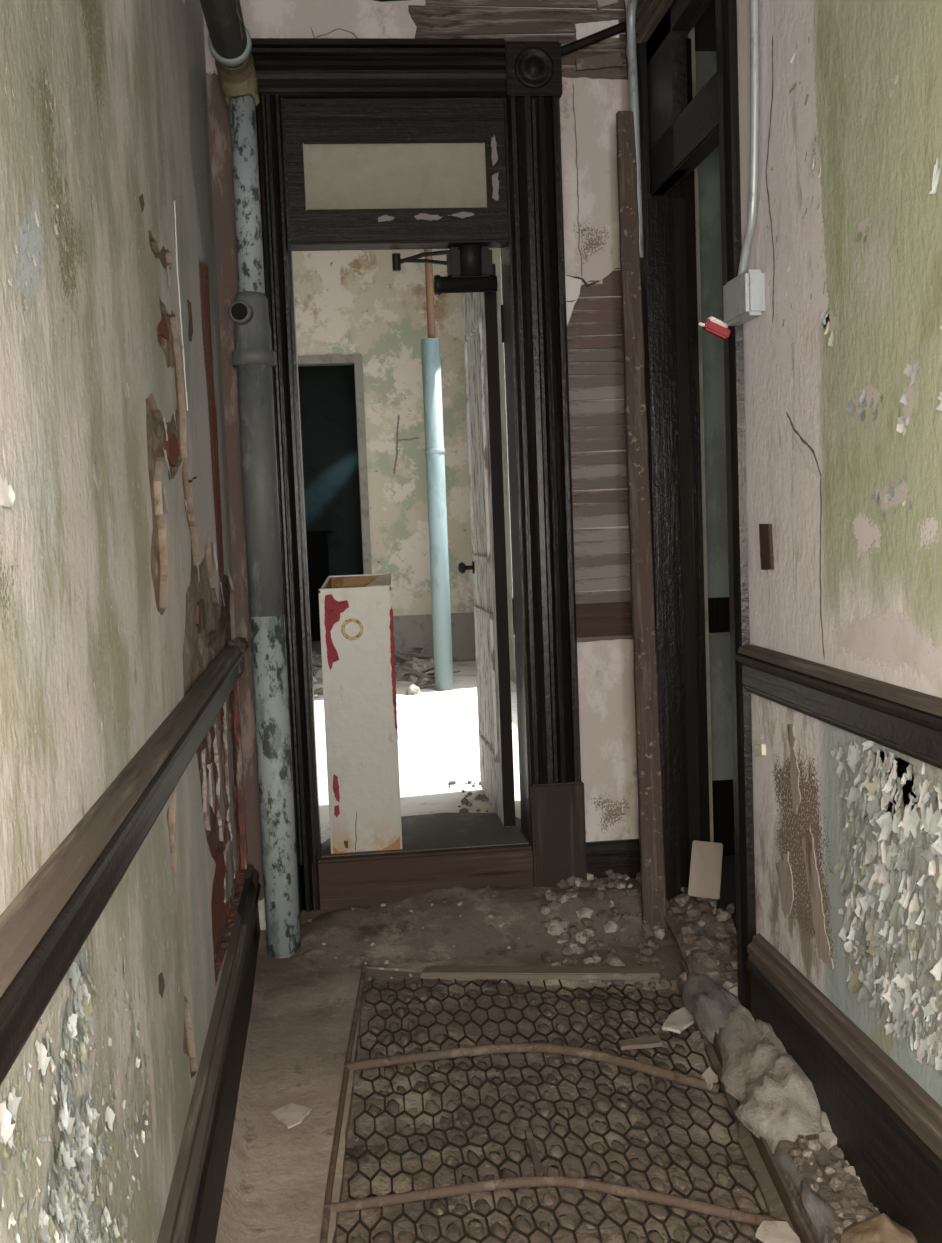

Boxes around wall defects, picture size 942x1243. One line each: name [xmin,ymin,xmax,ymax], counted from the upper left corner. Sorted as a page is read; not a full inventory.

flaking render [145,230,236,696]
crack [786,412,825,658]
peeling [896,343,921,435]
flaking render [195,680,247,984]
peeling [753,724,942,1077]
peeling [0,939,152,1243]